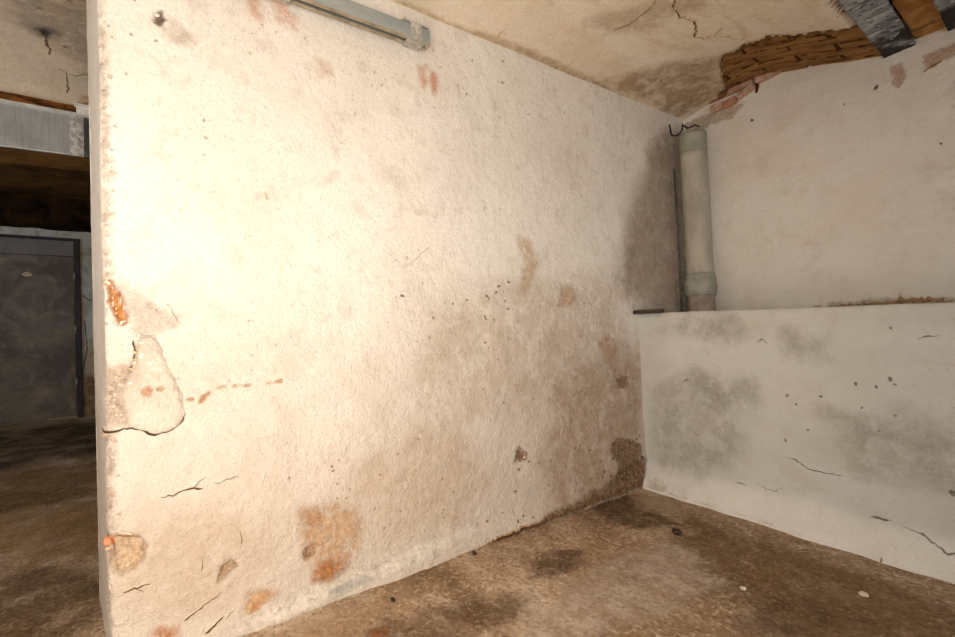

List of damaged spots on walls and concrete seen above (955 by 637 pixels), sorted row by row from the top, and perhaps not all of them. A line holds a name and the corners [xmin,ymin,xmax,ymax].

damp [18,0,88,61]
crack [615,0,761,41]
spalling [685,0,882,132]
peeling [891,65,905,87]
peeling [925,45,955,67]
spalling [101,268,127,326]
crack [786,457,842,476]
crack [161,476,239,498]
spalling [103,534,147,573]
spalling [303,544,317,561]
crack [870,516,955,556]
crack [184,592,236,634]